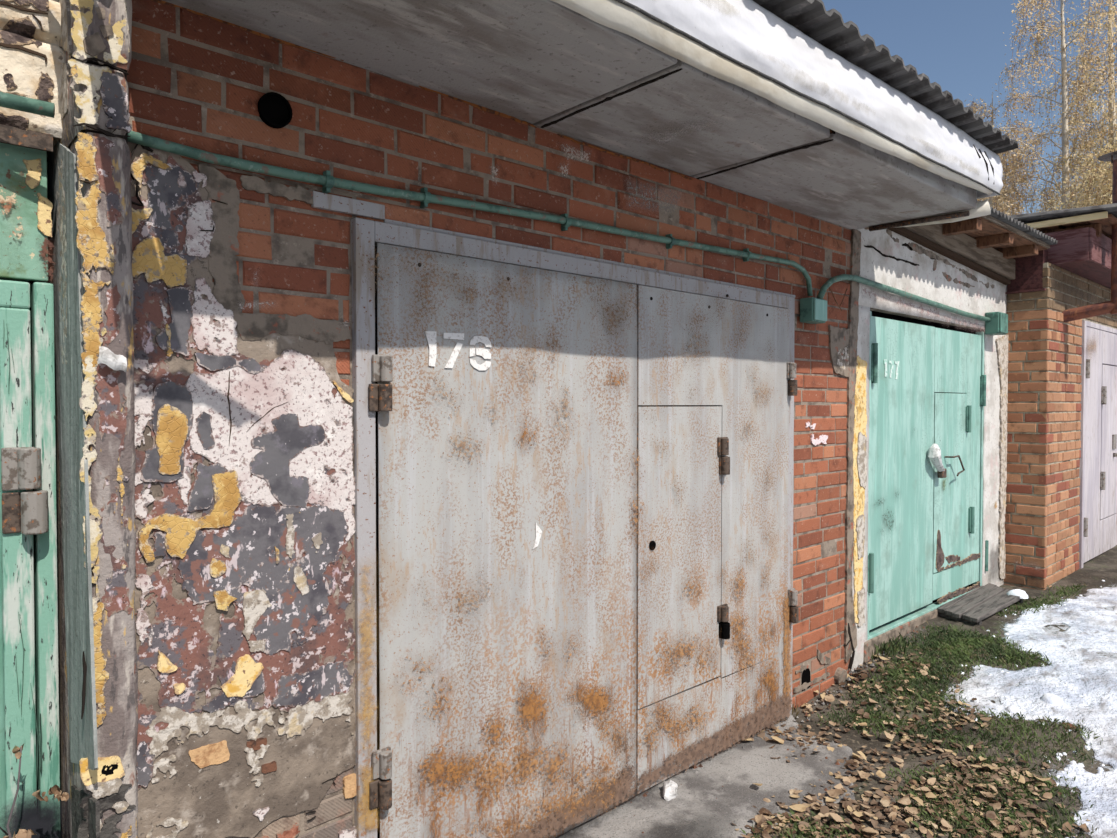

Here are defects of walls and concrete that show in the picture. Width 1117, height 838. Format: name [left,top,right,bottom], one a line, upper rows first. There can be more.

peeling [0,0,357,838]
corrosion [507,321,576,476]
corrosion [388,526,793,838]
corrosion [623,441,645,543]
peeling [852,355,867,627]
corrosion [936,530,981,572]